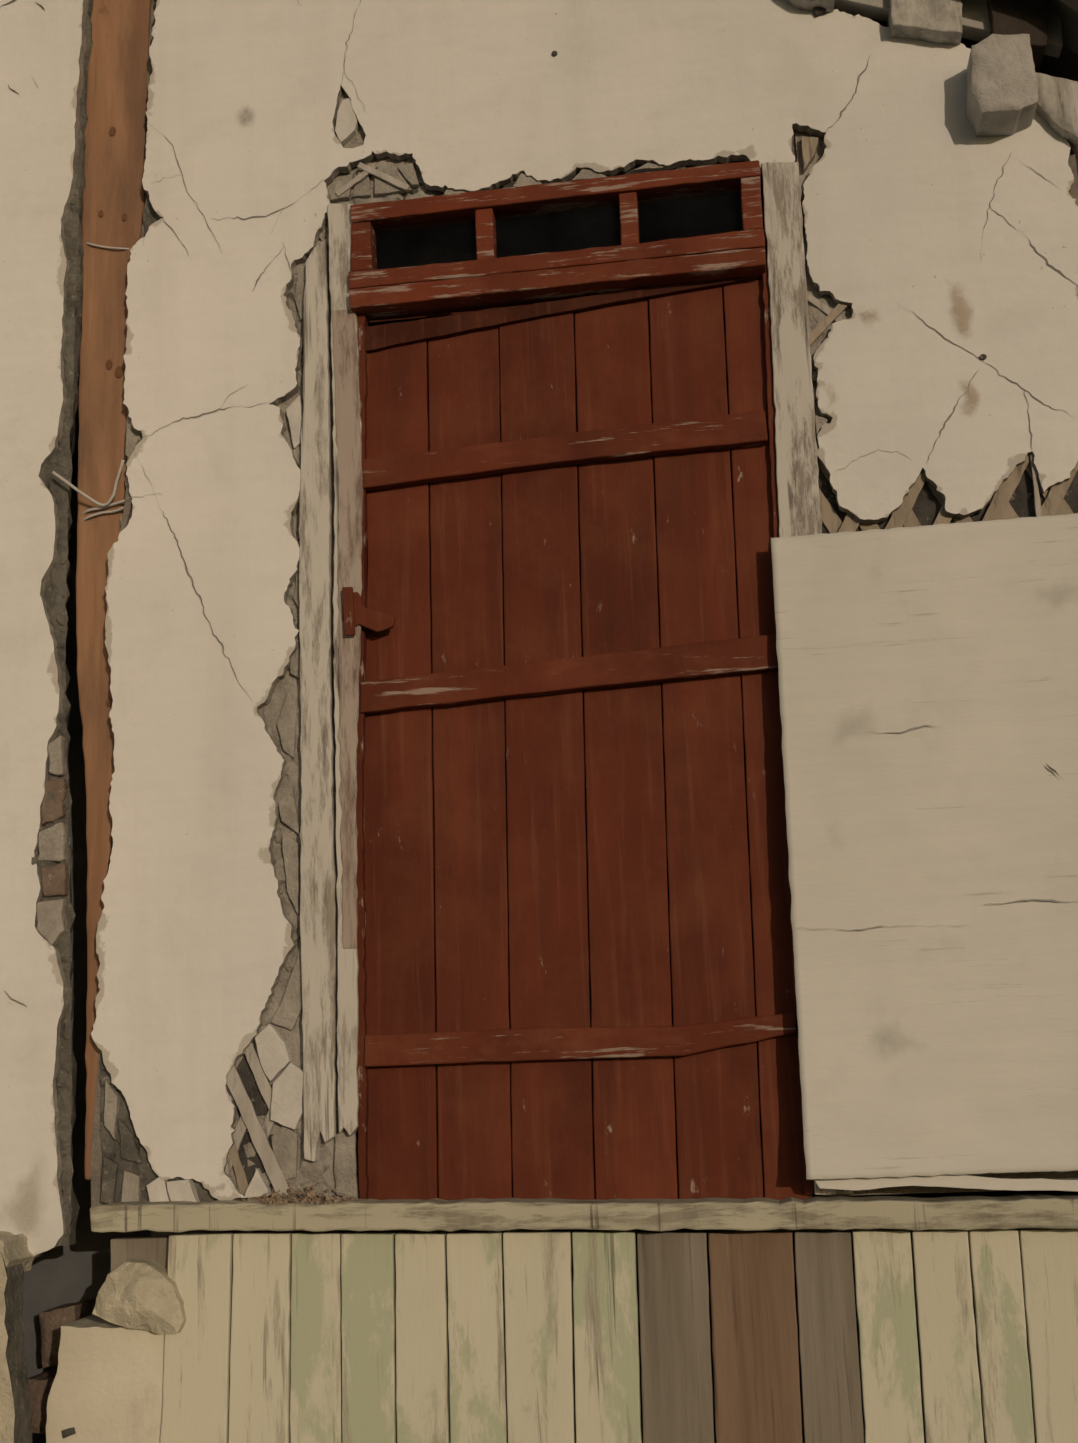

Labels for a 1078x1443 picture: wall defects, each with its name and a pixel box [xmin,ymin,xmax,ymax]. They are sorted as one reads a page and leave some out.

crack [147,123,320,291]
crack [341,0,365,109]
spalling [493,173,542,190]
spalling [568,160,746,181]
crack [827,58,869,130]
crack [980,154,1077,285]
crack [31,0,89,1237]
spalling [120,407,143,532]
crack [127,384,264,699]
spalling [793,130,1078,534]
crack [838,302,1075,470]
spalling [225,572,343,1201]